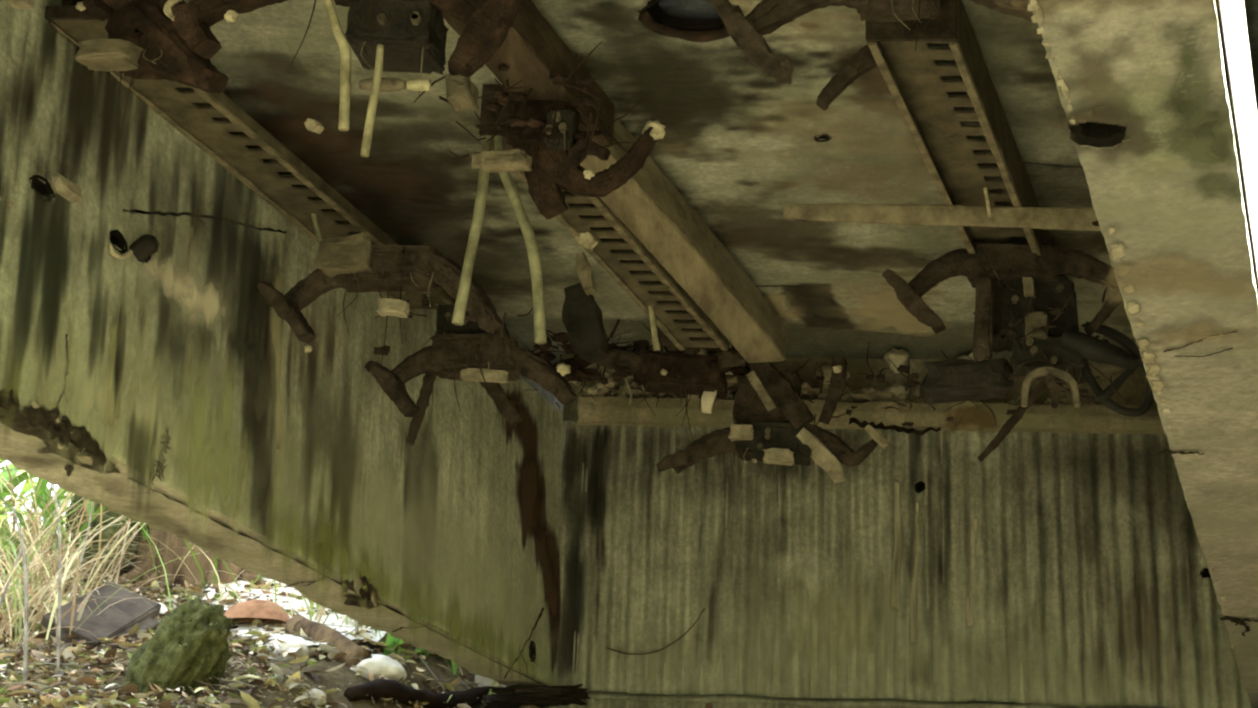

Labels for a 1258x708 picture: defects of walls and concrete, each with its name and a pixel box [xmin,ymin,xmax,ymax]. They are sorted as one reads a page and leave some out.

leakage [12,23,56,121]
leakage [61,47,145,185]
leakage [223,55,544,293]
leakage [580,4,780,156]
leakage [17,196,68,409]
spalling [0,386,119,477]
leakage [93,285,145,427]
leakage [130,427,155,498]
leakage [145,175,282,544]
corrosion [506,391,561,669]
leakage [558,428,608,673]
leakage [697,204,934,334]